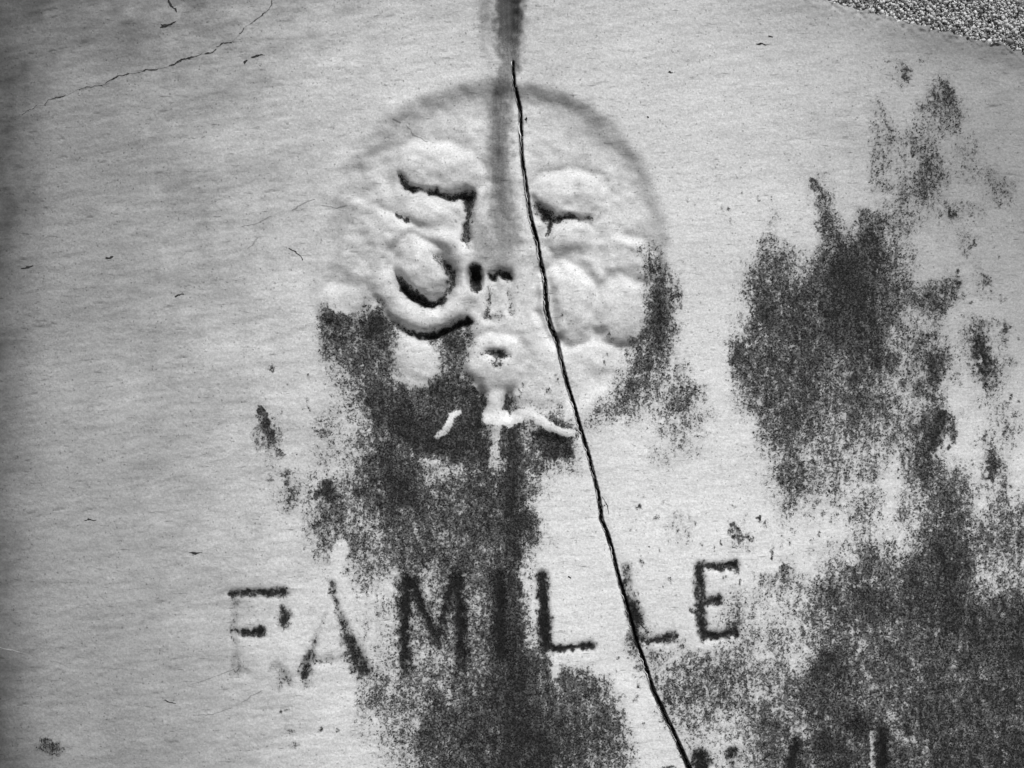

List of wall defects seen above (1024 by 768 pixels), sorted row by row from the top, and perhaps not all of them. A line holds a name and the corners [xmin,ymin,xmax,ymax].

damp [492,0,523,202]
crack [511,62,691,768]
damp [253,75,1024,768]
damp [884,59,924,87]